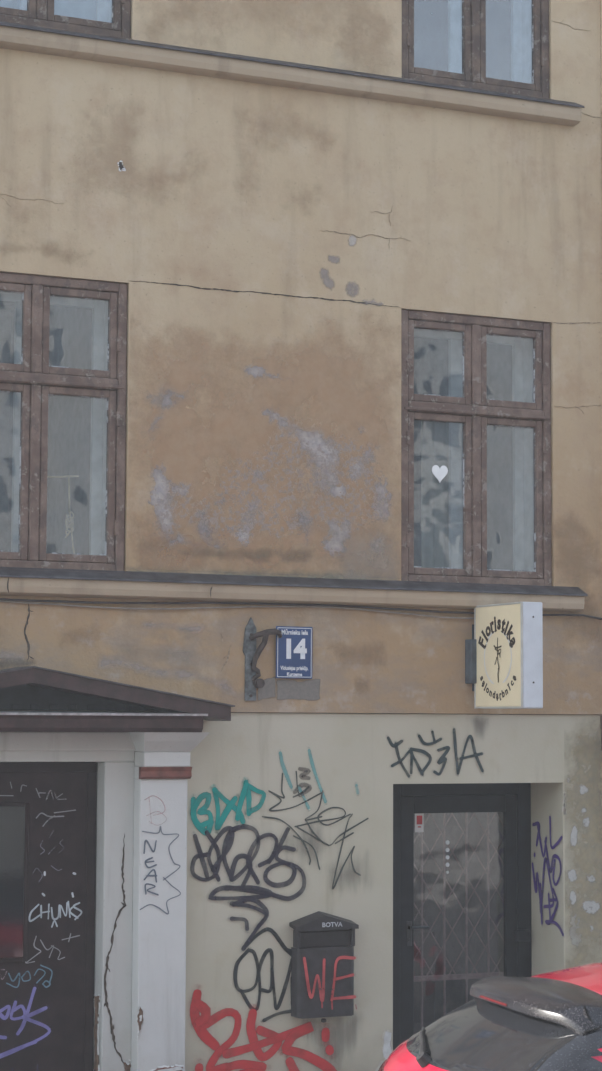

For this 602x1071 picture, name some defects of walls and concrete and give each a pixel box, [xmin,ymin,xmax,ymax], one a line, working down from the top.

crack [327,210,410,242]
peeling [263,410,372,498]
crack [7,578,33,660]
peeling [568,869,600,947]
crack [104,834,127,1064]
spalling [93,993,101,1071]
spalling [136,1007,145,1038]
spalling [123,1059,185,1071]